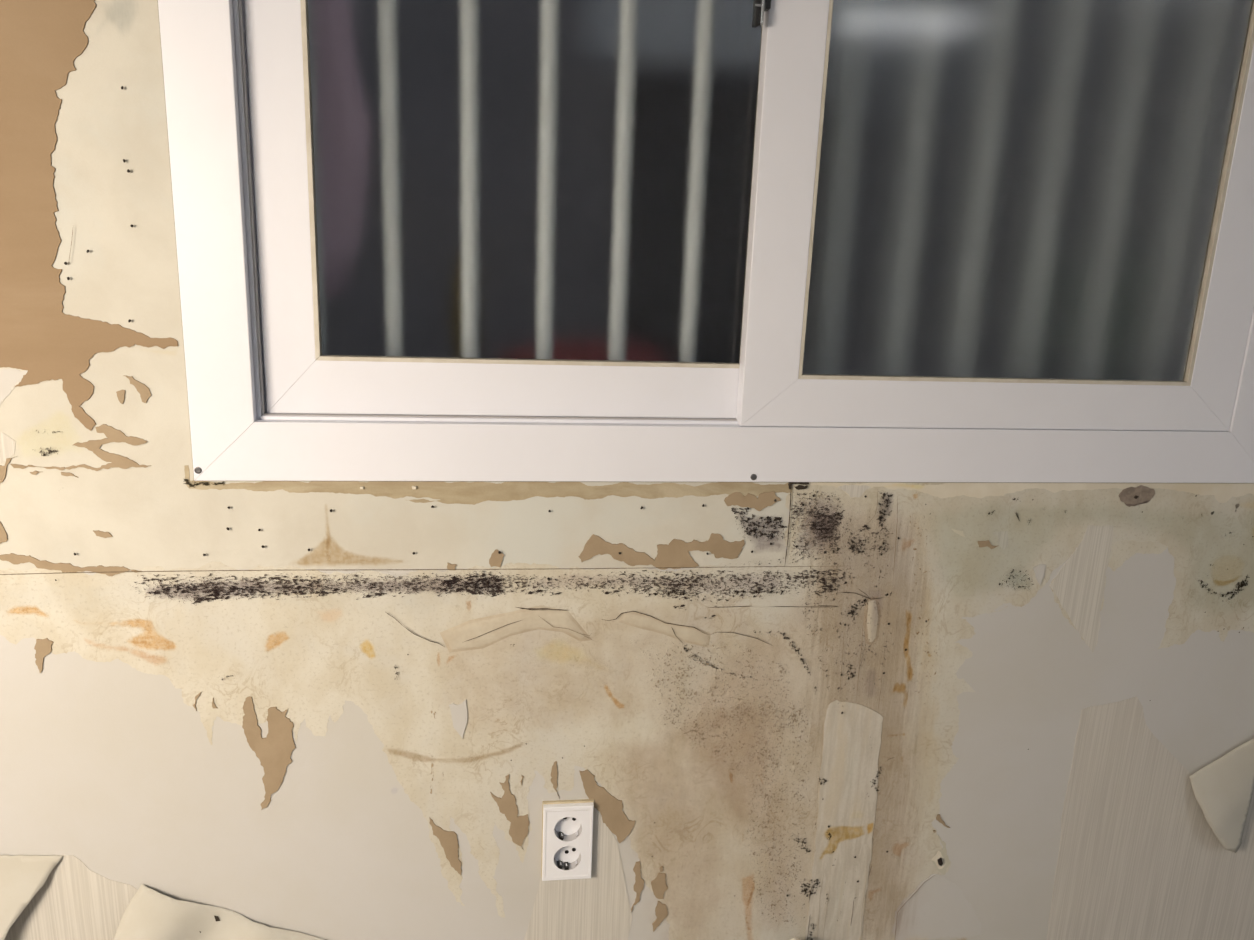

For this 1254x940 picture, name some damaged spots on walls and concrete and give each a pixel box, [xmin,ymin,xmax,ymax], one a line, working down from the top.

flaking render [0,0,789,570]
water stain [134,490,893,924]
peeling [0,484,1254,940]
water stain [1199,575,1250,600]